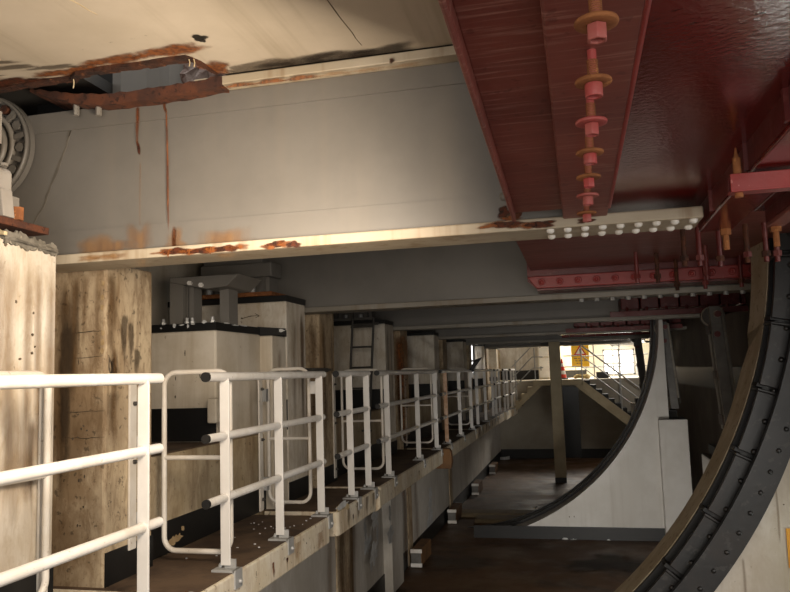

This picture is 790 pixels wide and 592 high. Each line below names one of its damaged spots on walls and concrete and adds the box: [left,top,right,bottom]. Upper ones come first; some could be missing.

rust [0,45,228,94]
rust [152,103,247,257]
rust [479,206,556,229]
rust [261,240,300,250]